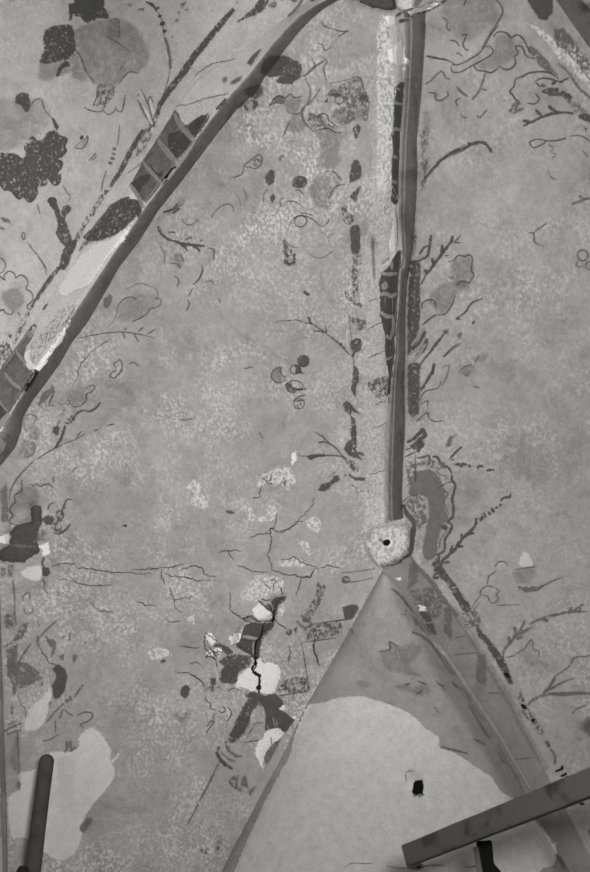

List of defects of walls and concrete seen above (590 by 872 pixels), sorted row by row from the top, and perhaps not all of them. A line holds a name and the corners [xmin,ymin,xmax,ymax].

flaking render [0,77,241,463]
flaking render [336,0,439,566]
flaking render [0,486,50,595]
crack [52,563,207,622]
peeling [186,480,208,509]
peeling [226,498,278,522]
crack [183,500,338,694]
peeling [240,539,311,621]
peeling [256,451,298,491]
peeling [306,516,321,533]
peeling [342,604,358,620]
peeling [5,614,67,703]